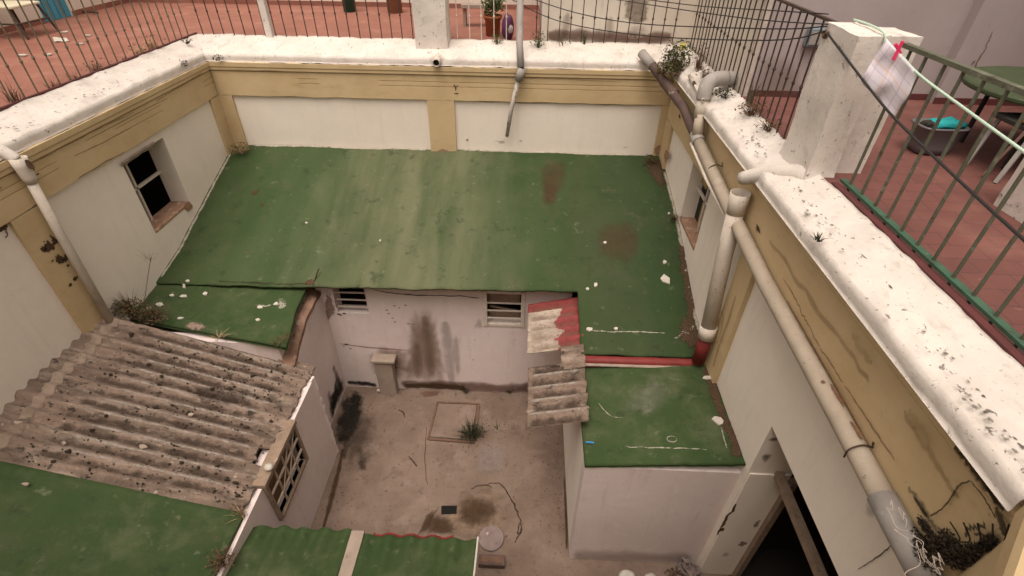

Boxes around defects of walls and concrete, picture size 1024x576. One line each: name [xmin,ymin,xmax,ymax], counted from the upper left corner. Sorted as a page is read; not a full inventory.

peeling [40,235,78,287]
water stain [383,323,528,396]
water stain [322,366,376,527]
crack [930,480,995,518]